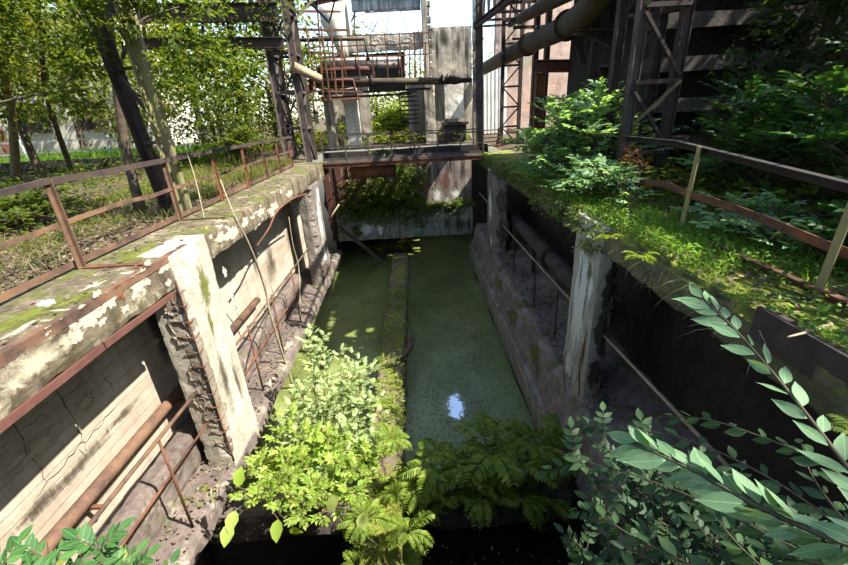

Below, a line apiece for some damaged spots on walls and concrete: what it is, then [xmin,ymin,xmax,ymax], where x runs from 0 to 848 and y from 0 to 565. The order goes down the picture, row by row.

spalling [209,187,331,280]
spalling [37,259,151,344]
spalling [222,267,239,316]
spalling [159,244,235,462]
crack [0,360,117,498]
leakage [24,442,100,520]